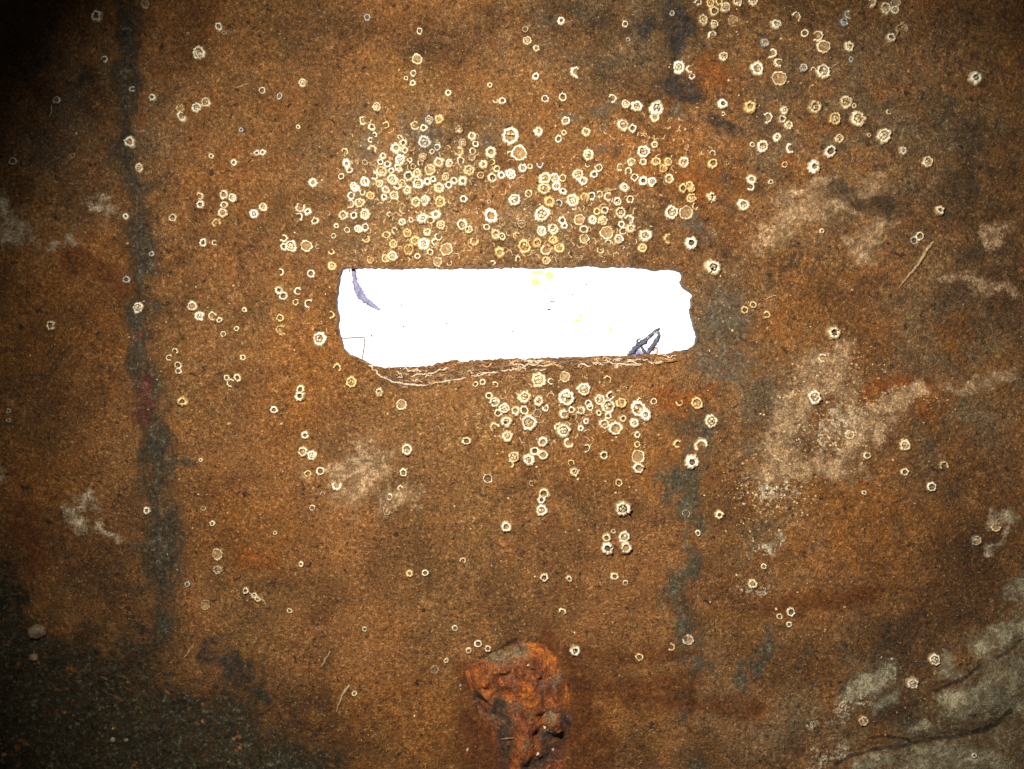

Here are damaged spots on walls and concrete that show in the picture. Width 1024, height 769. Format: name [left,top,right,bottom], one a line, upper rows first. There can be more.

water stain [110,0,194,653]